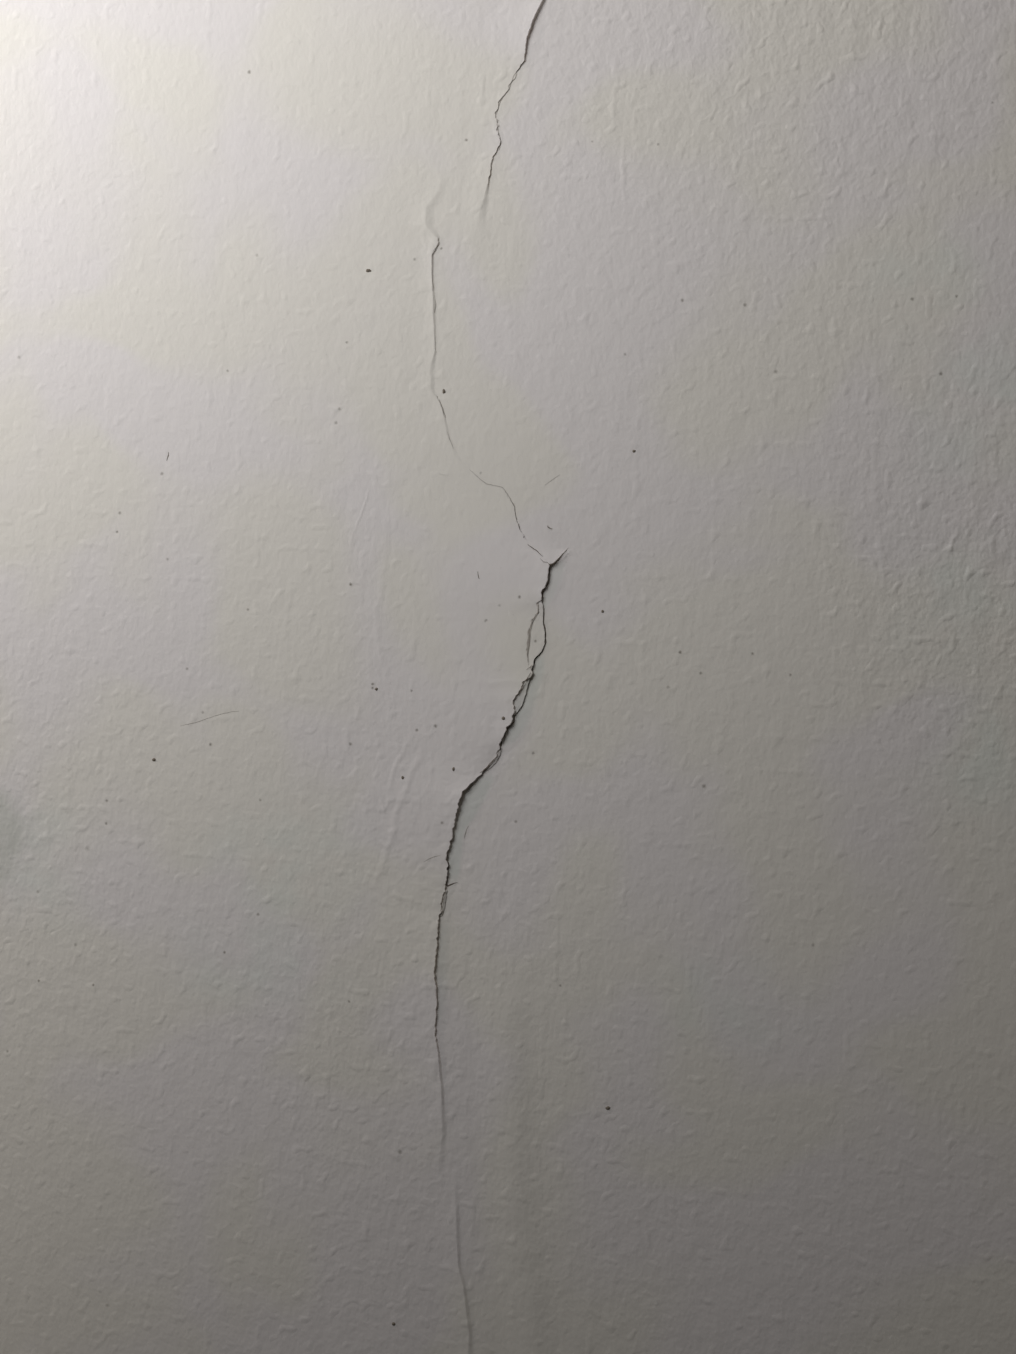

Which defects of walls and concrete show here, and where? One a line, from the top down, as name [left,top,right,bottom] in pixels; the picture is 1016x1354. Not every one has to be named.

peeling [331,472,568,1193]
crack [469,469,566,565]